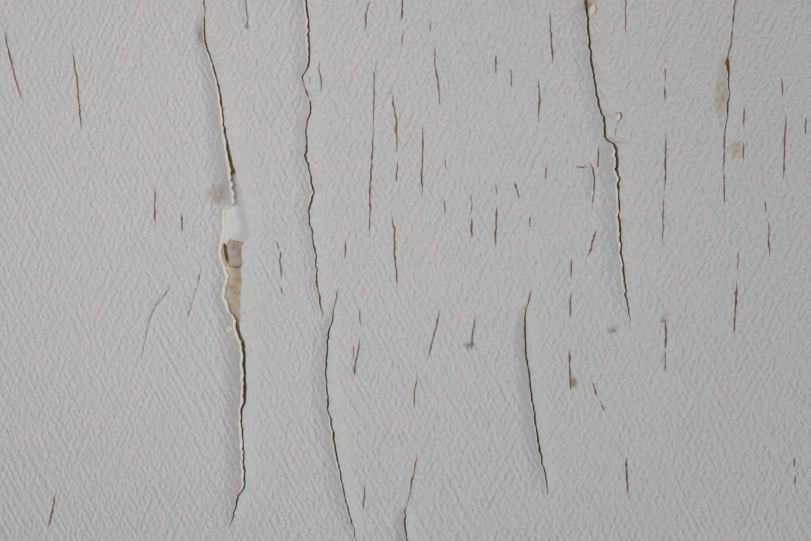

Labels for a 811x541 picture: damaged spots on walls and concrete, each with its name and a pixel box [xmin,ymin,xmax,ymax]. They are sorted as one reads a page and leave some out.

crack [576,112,622,211]
flaking render [223,174,249,268]
crack [569,231,596,315]
crack [353,312,361,376]
crack [569,348,605,412]